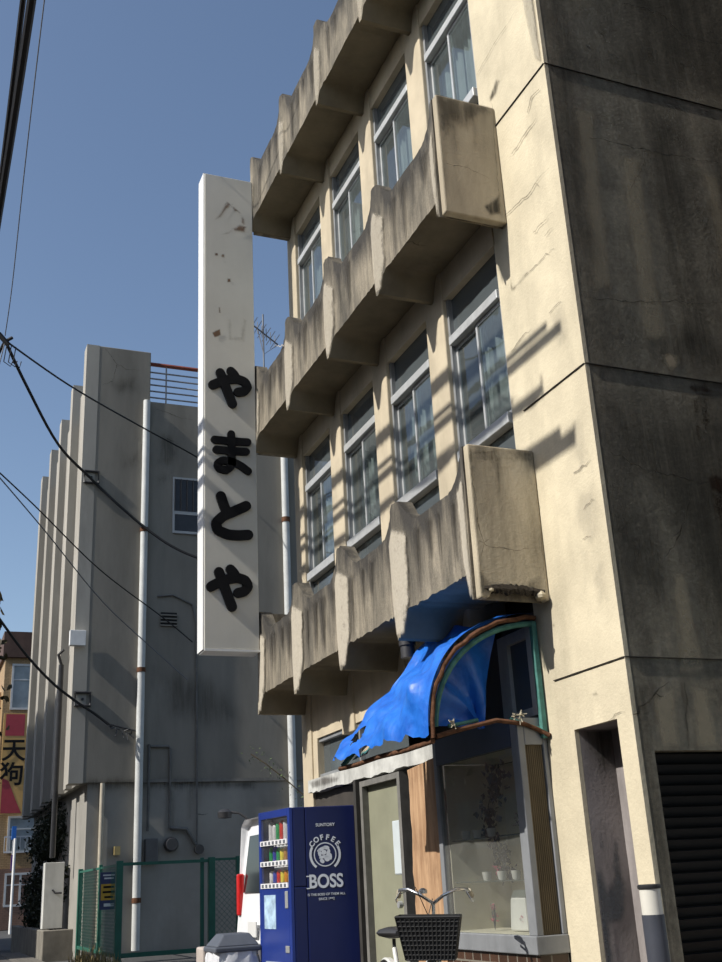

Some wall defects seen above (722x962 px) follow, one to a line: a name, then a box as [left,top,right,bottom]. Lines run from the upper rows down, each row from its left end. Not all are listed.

damp [439,97,475,127]
damp [486,198,499,213]
crack [473,479,547,592]
damp [597,846,624,962]